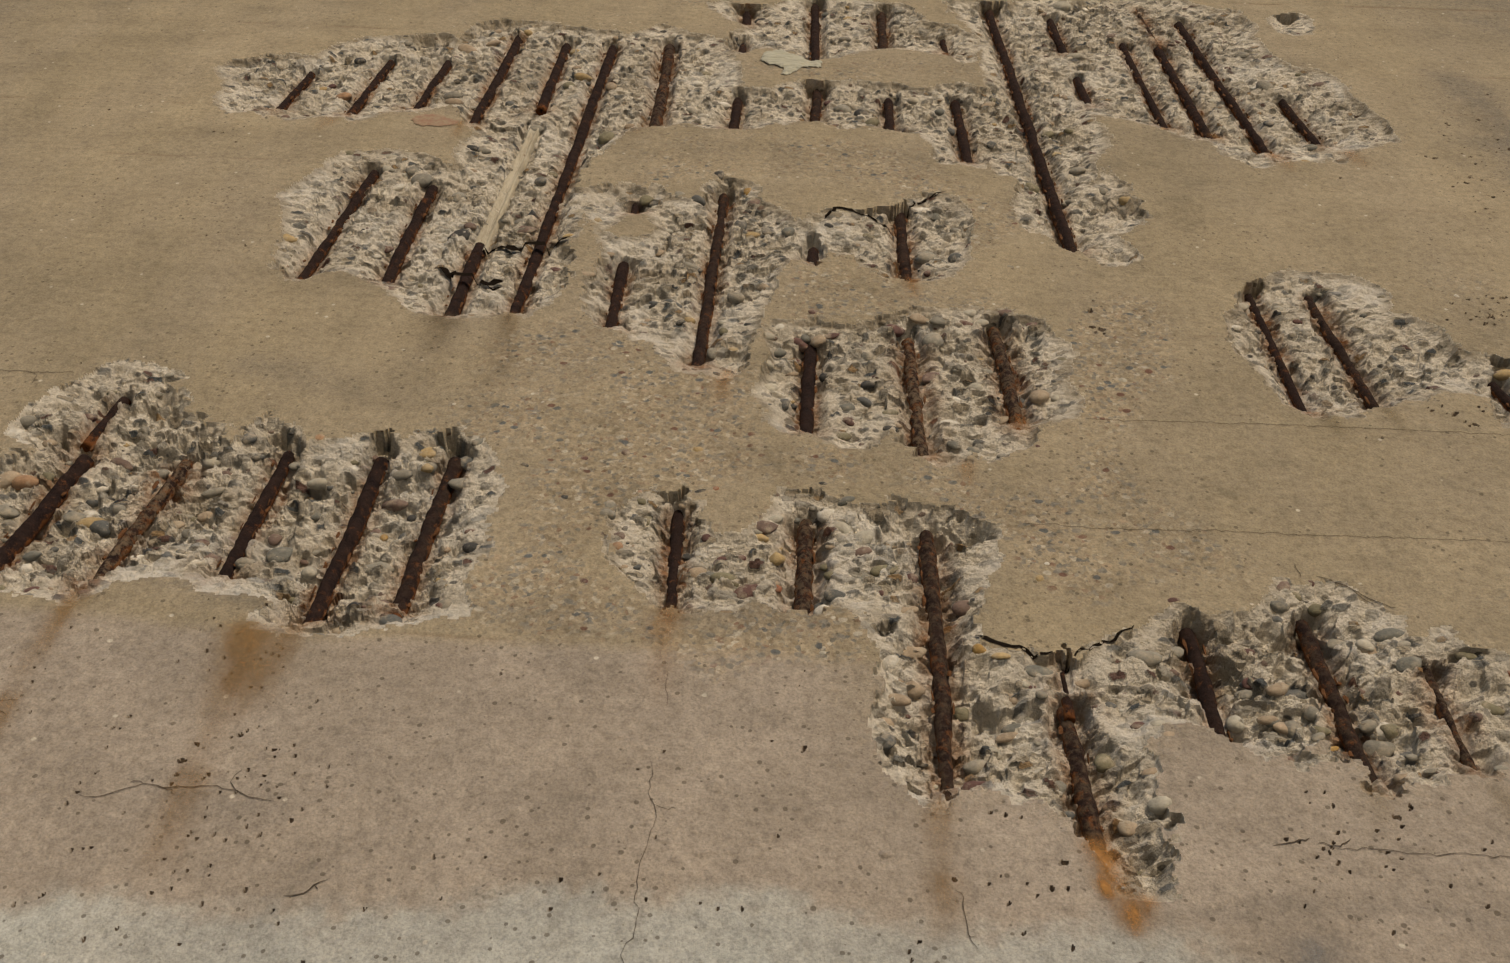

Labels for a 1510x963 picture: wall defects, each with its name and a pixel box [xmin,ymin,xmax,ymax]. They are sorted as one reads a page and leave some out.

spalling [212,0,1402,468]
spalling [1223,269,1510,428]
spalling [0,356,510,668]
crack [975,625,1134,673]
spalling [601,482,1510,902]